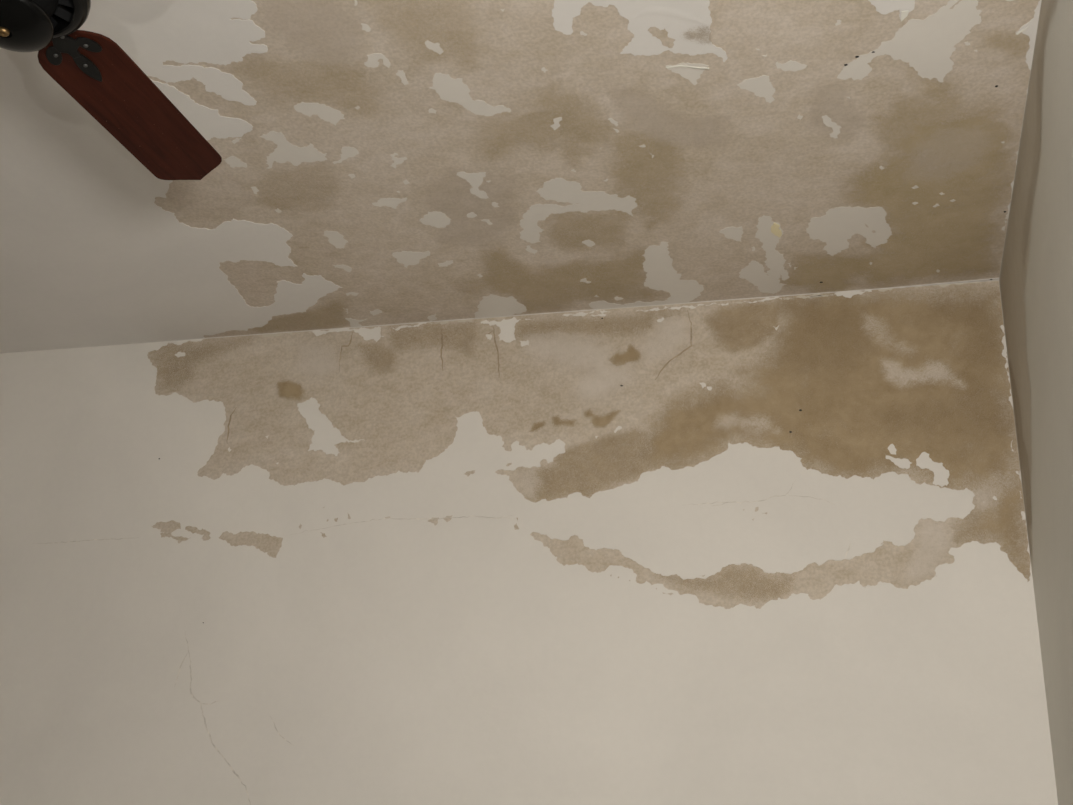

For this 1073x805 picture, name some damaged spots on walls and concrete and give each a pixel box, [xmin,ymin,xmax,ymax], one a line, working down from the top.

water stain [153,294,351,392]
water stain [275,379,306,403]
peeling [147,0,1040,609]
crack [655,310,692,380]
water stain [419,0,1058,586]
water stain [652,564,800,606]